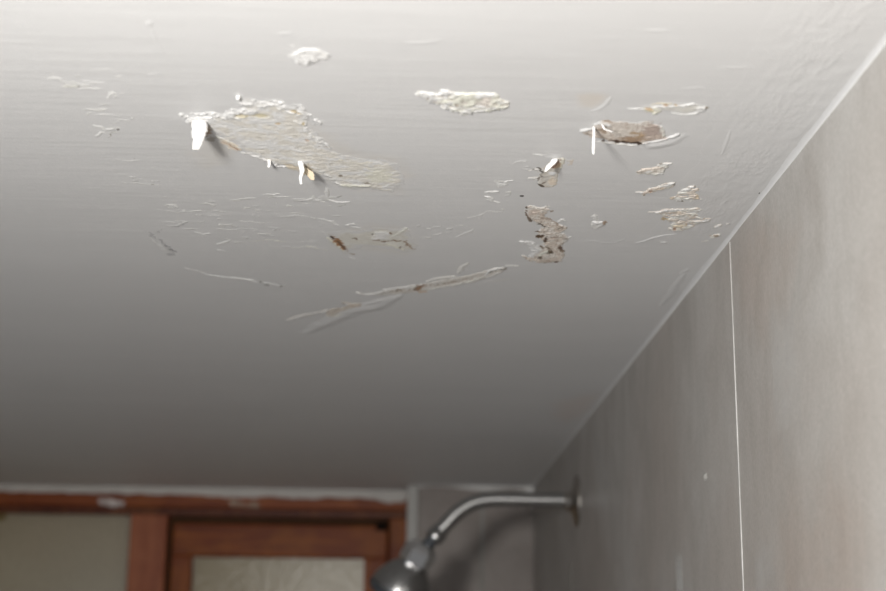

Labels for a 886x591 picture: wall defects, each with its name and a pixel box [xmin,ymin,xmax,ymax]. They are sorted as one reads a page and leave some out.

peeling [288,45,331,66]
peeling [414,89,510,116]
spalling [579,102,710,154]
peeling [179,96,405,207]
spalling [528,158,574,187]
peeling [324,223,419,260]
spalling [518,205,573,263]